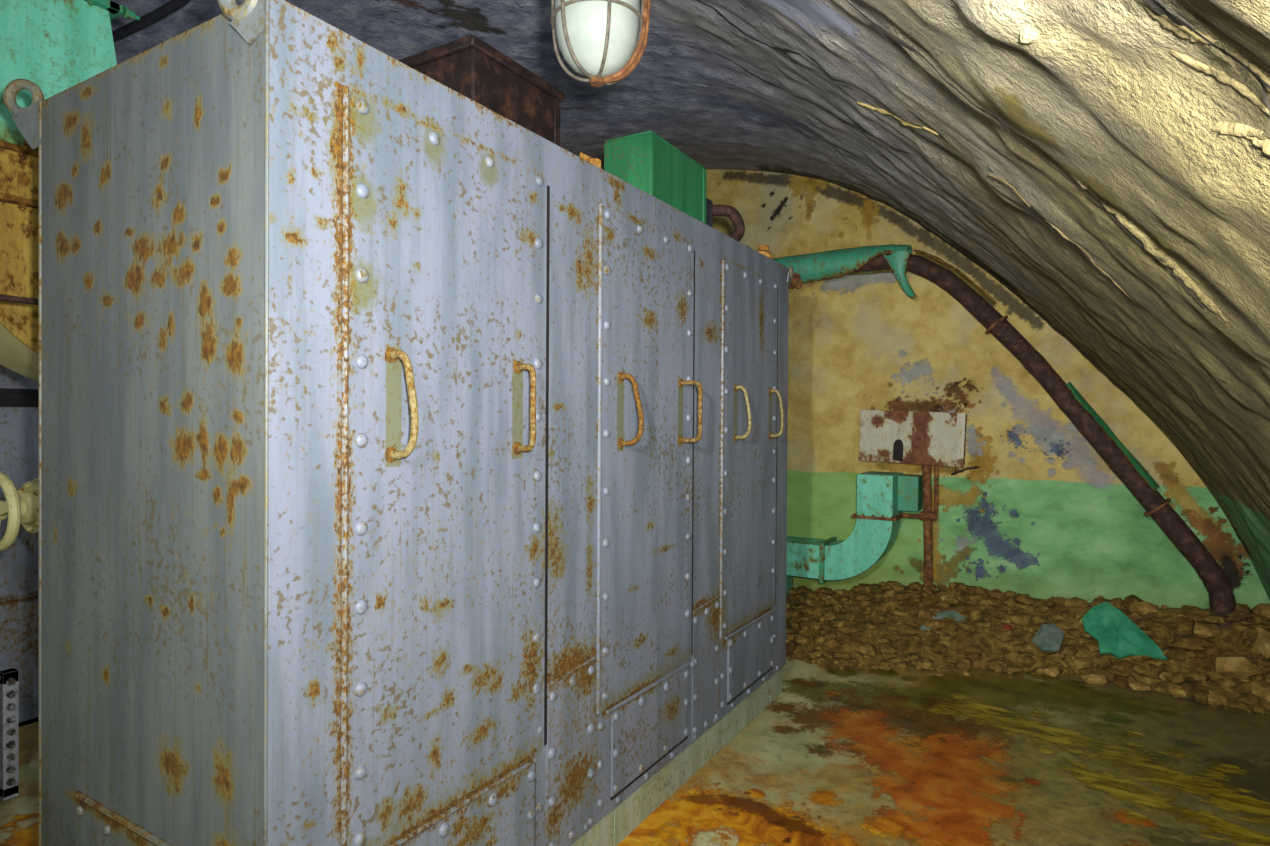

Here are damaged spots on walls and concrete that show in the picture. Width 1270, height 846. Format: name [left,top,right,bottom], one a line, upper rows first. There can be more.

crack [1142,0,1270,114]
peeling [1000,422,1080,476]
peeling [940,492,1040,581]
rust [617,679,1041,846]